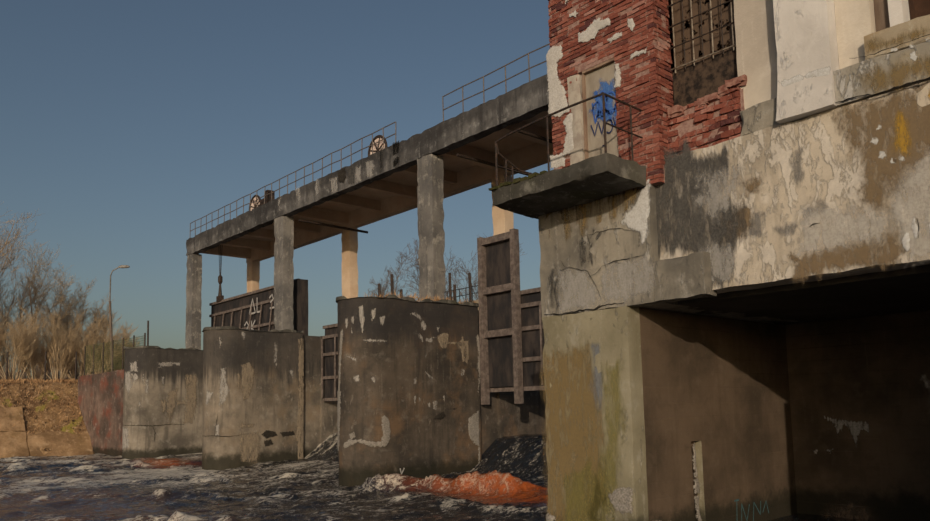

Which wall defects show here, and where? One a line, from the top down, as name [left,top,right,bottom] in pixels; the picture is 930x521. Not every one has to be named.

flaking render [578,18,635,42]
flaking render [546,45,574,169]
leakage [793,152,802,181]
leakage [655,139,762,288]
peeling [798,209,885,255]
peeling [893,157,930,256]
crack [544,255,643,315]
leakage [541,345,606,521]
spalling [608,487,633,514]
spalling [692,444,701,521]